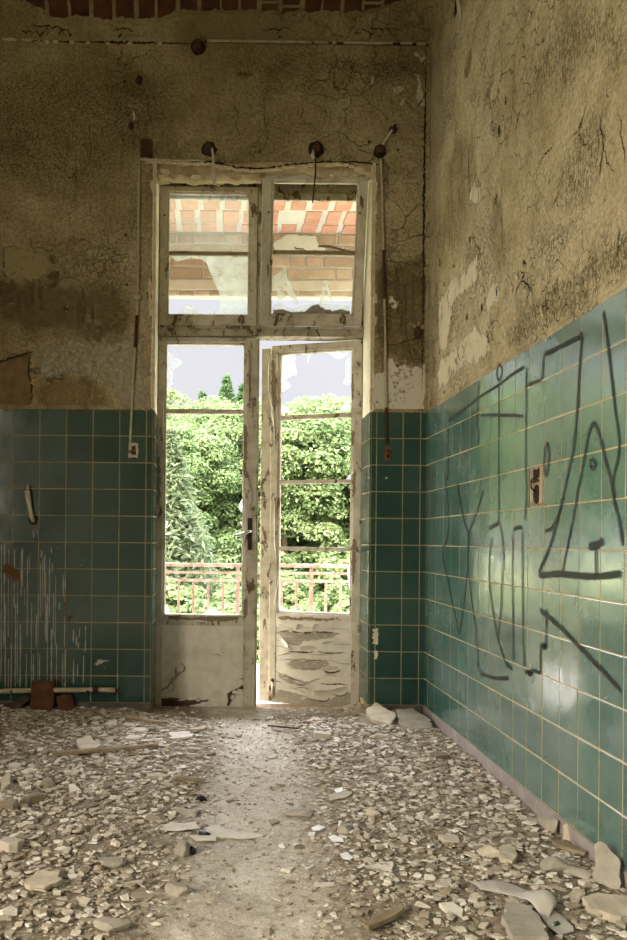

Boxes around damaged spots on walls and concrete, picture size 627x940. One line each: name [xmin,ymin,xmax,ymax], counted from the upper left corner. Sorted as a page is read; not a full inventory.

flaking render [21,0,401,20]
crack [353,24,427,381]
crack [535,109,625,208]
spalling [149,163,425,410]
peeling [437,236,501,393]
crack [509,262,550,320]
spalling [0,348,34,411]
water stain [0,544,110,688]
peeling [154,662,209,707]
peeling [227,675,246,706]
peeling [276,616,355,707]